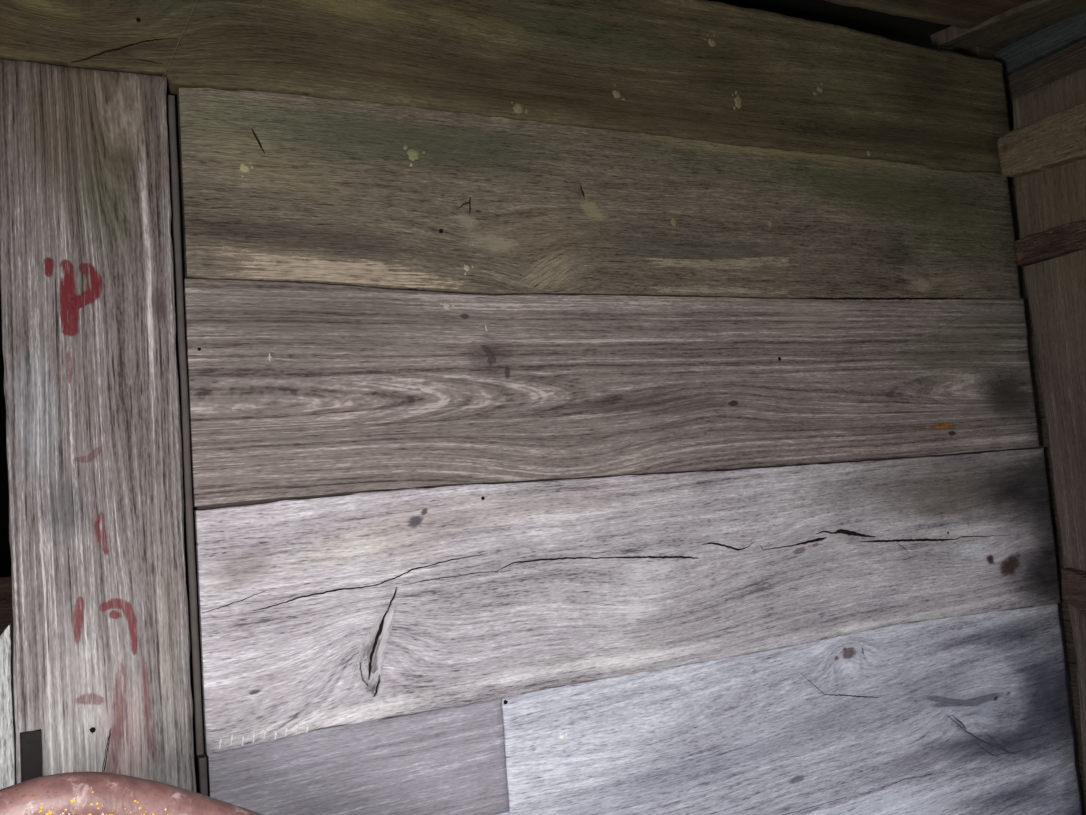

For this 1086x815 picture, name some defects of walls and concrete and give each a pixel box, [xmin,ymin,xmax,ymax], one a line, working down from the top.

crack [204,529,1003,698]